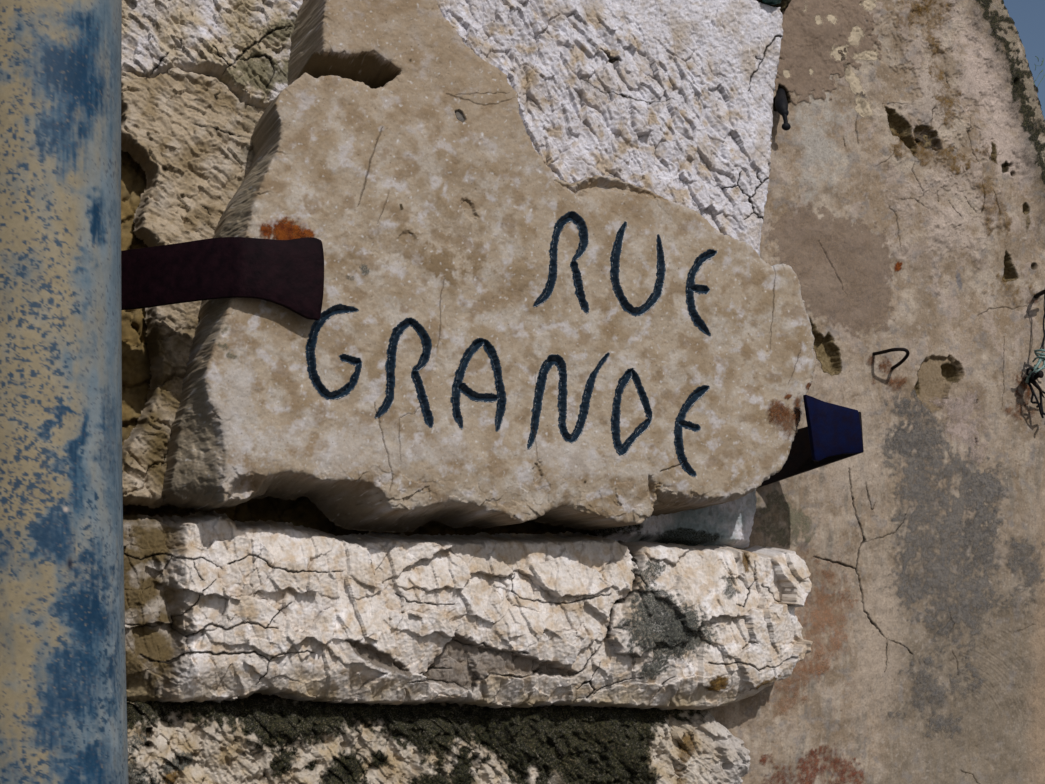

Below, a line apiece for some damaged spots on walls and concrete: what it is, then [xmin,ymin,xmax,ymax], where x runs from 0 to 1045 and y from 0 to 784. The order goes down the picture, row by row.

crack [748,36,782,91]
peeling [775,0,938,156]
crack [721,172,769,221]
peeling [769,202,895,375]
spalling [1002,251,1018,282]
spalling [914,355,986,462]
crack [511,553,647,638]
crack [464,652,534,689]
crack [575,659,623,698]